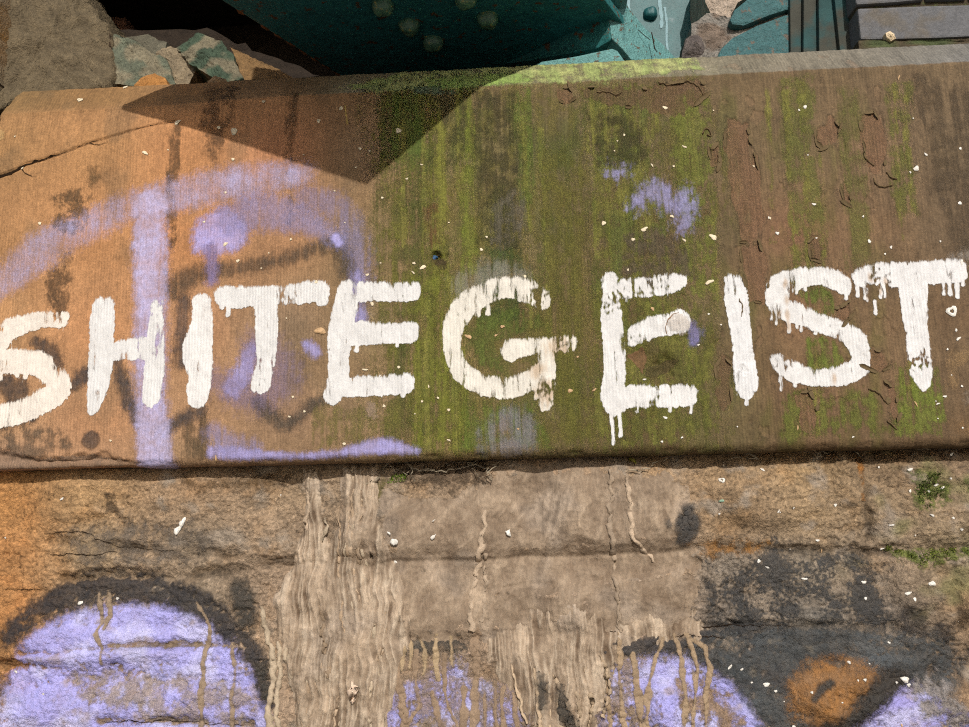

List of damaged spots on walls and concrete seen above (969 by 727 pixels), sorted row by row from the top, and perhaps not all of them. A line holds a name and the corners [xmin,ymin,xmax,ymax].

crack [0,120,175,177]
damp [622,228,690,283]
damp [394,460,489,493]
damp [395,626,521,727]
damp [605,632,714,727]